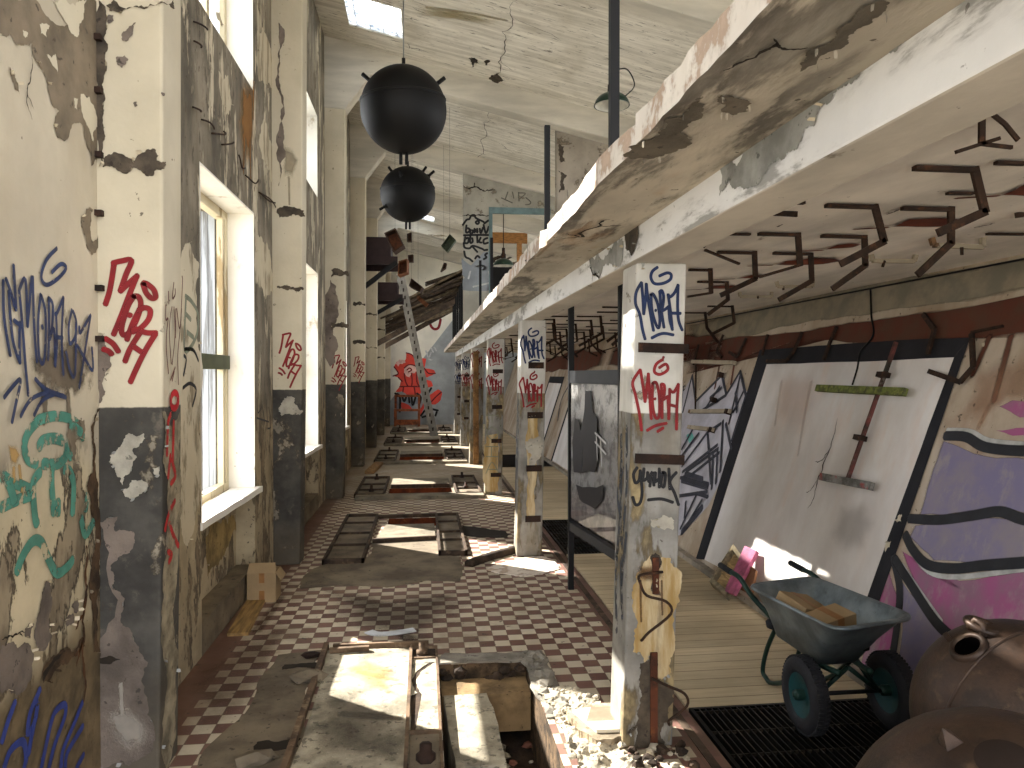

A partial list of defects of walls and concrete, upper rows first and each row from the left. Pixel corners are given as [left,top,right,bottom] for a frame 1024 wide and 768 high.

peeling [0,0,175,176]
spalling [275,23,286,186]
crack [492,2,554,77]
crack [724,39,806,71]
peeling [719,72,861,196]
peeling [81,207,98,255]
spalling [275,206,305,217]
peeling [278,396,303,416]
crack [807,422,837,504]
peeling [0,333,193,768]
corrosion [640,568,663,622]
peeling [627,553,682,749]